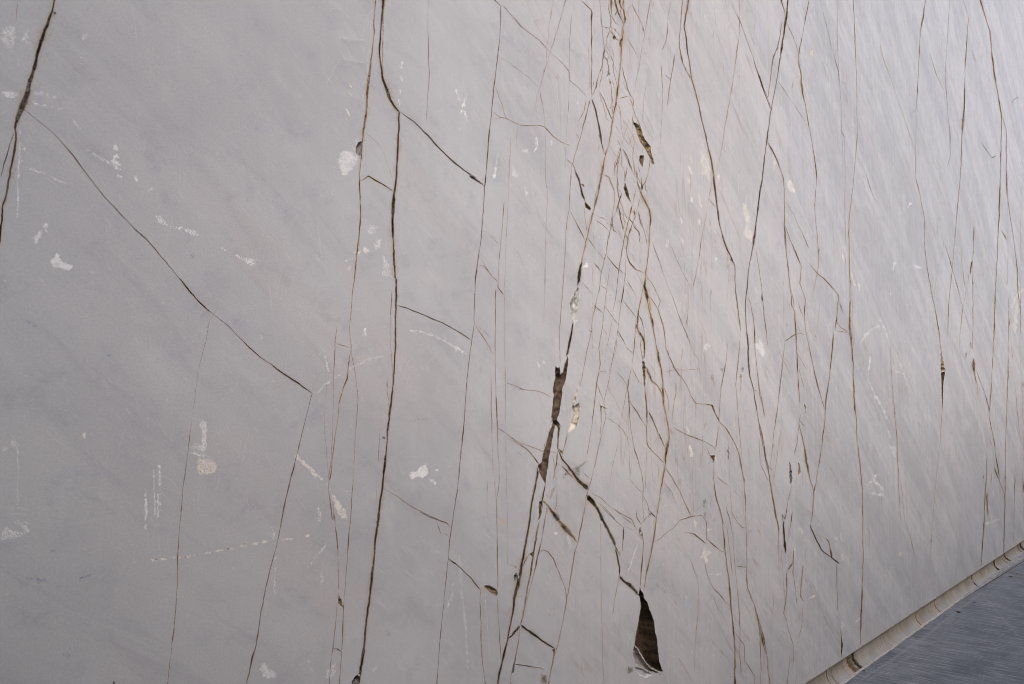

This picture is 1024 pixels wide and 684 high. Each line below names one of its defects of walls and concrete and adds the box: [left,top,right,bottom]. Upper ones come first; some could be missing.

crack [0,0,320,684]
spalling [538,355,581,484]
crack [321,0,864,684]
spalling [633,120,655,167]
spalling [628,587,662,678]
crack [880,0,1024,604]